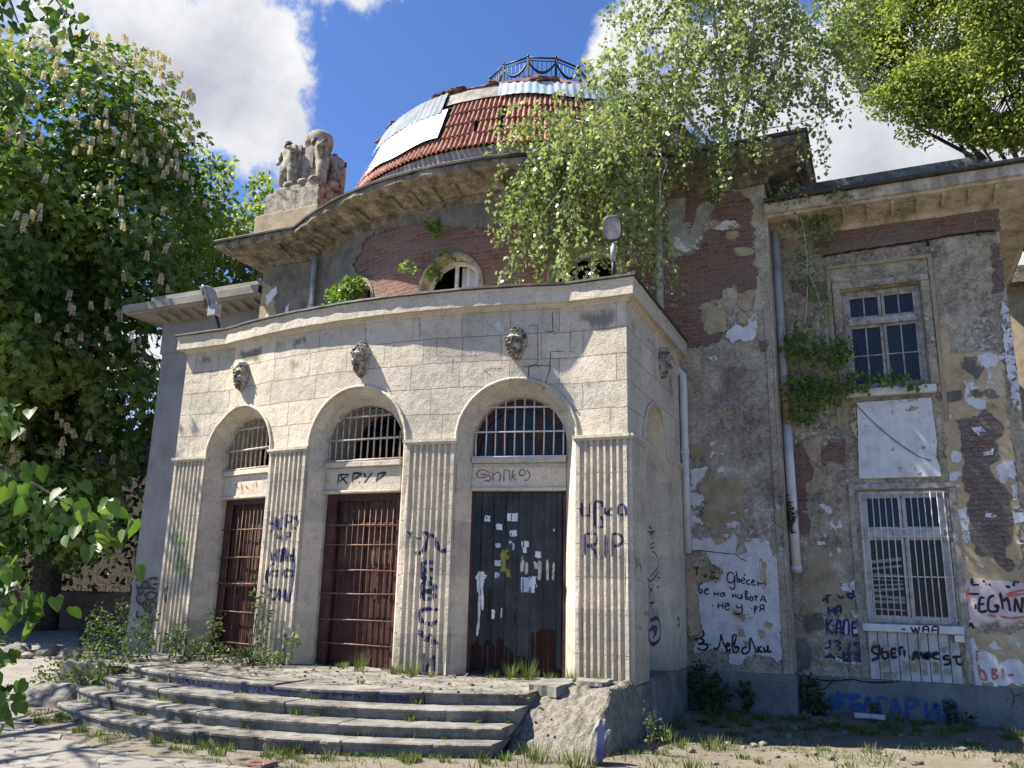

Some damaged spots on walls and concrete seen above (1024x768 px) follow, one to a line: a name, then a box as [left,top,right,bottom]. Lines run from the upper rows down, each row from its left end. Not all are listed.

flaking render [311,198,527,306]
crack [419,312,573,391]
spalling [668,189,768,362]
peeling [685,415,783,665]
flaking render [794,406,874,674]
flaking render [813,209,1024,687]